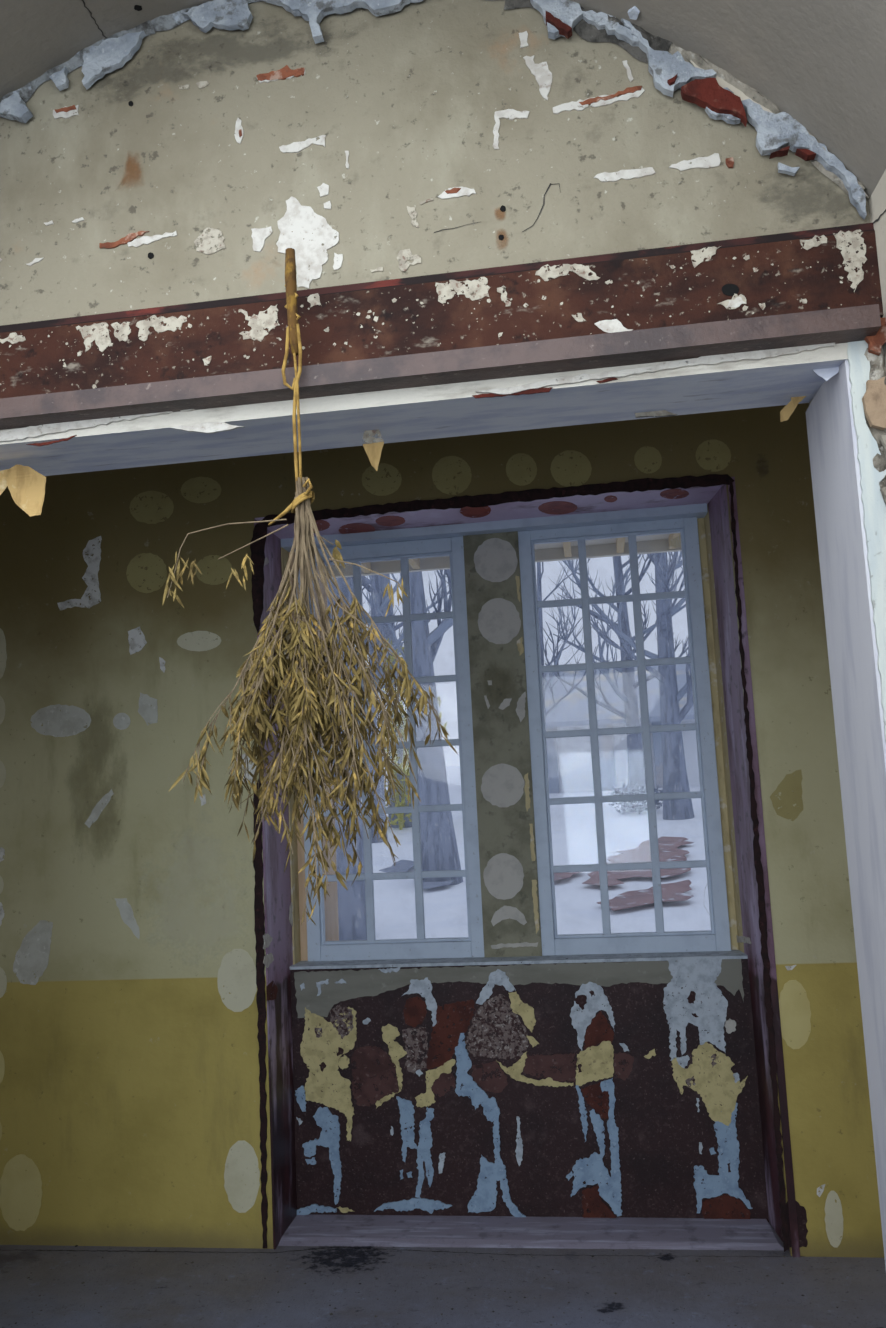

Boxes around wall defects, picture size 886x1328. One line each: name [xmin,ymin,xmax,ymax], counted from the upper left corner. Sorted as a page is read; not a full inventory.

crack [82,0,107,39]
flaking render [0,0,423,123]
flaking render [504,0,869,292]
peeling [435,277,511,307]
peeling [718,294,765,310]
peeling [0,333,26,344]
peeling [76,315,187,352]
peeling [239,305,280,342]
peeling [572,313,633,333]
peeling [0,409,244,446]
flaking render [472,317,886,742]
peeling [295,956,753,1219]